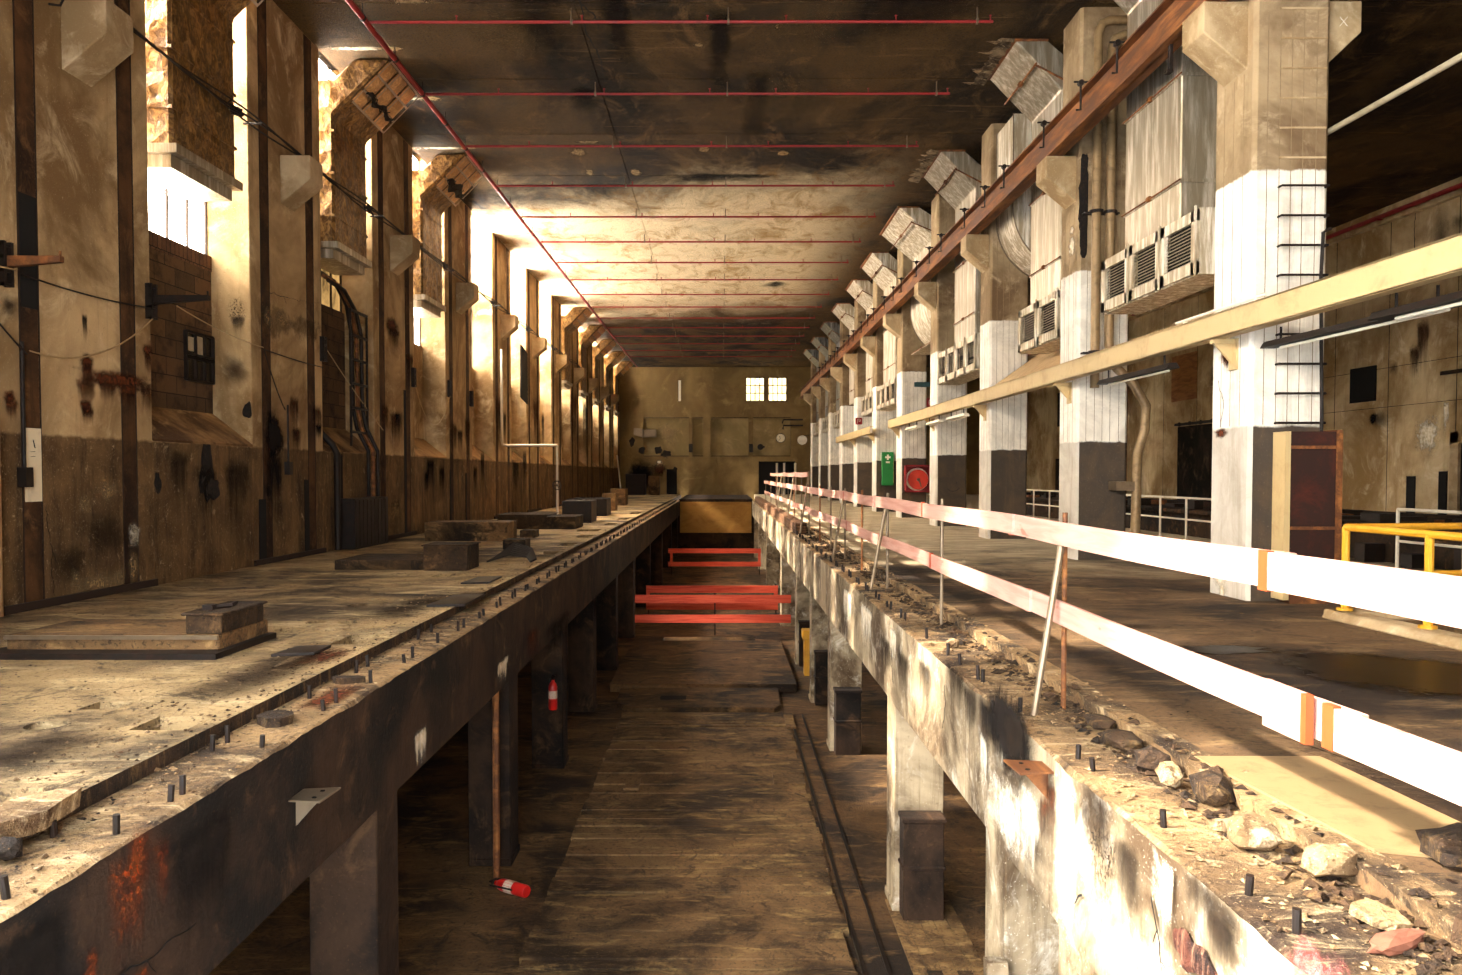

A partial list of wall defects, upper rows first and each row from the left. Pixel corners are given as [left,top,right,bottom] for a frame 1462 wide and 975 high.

water stain [517,0,631,56]
water stain [694,18,727,80]
water stain [572,89,594,108]
water stain [746,78,807,131]
rust [115,832,167,917]
water stain [1057,787,1135,919]
water stain [1162,866,1236,954]
spalling [1173,927,1215,975]